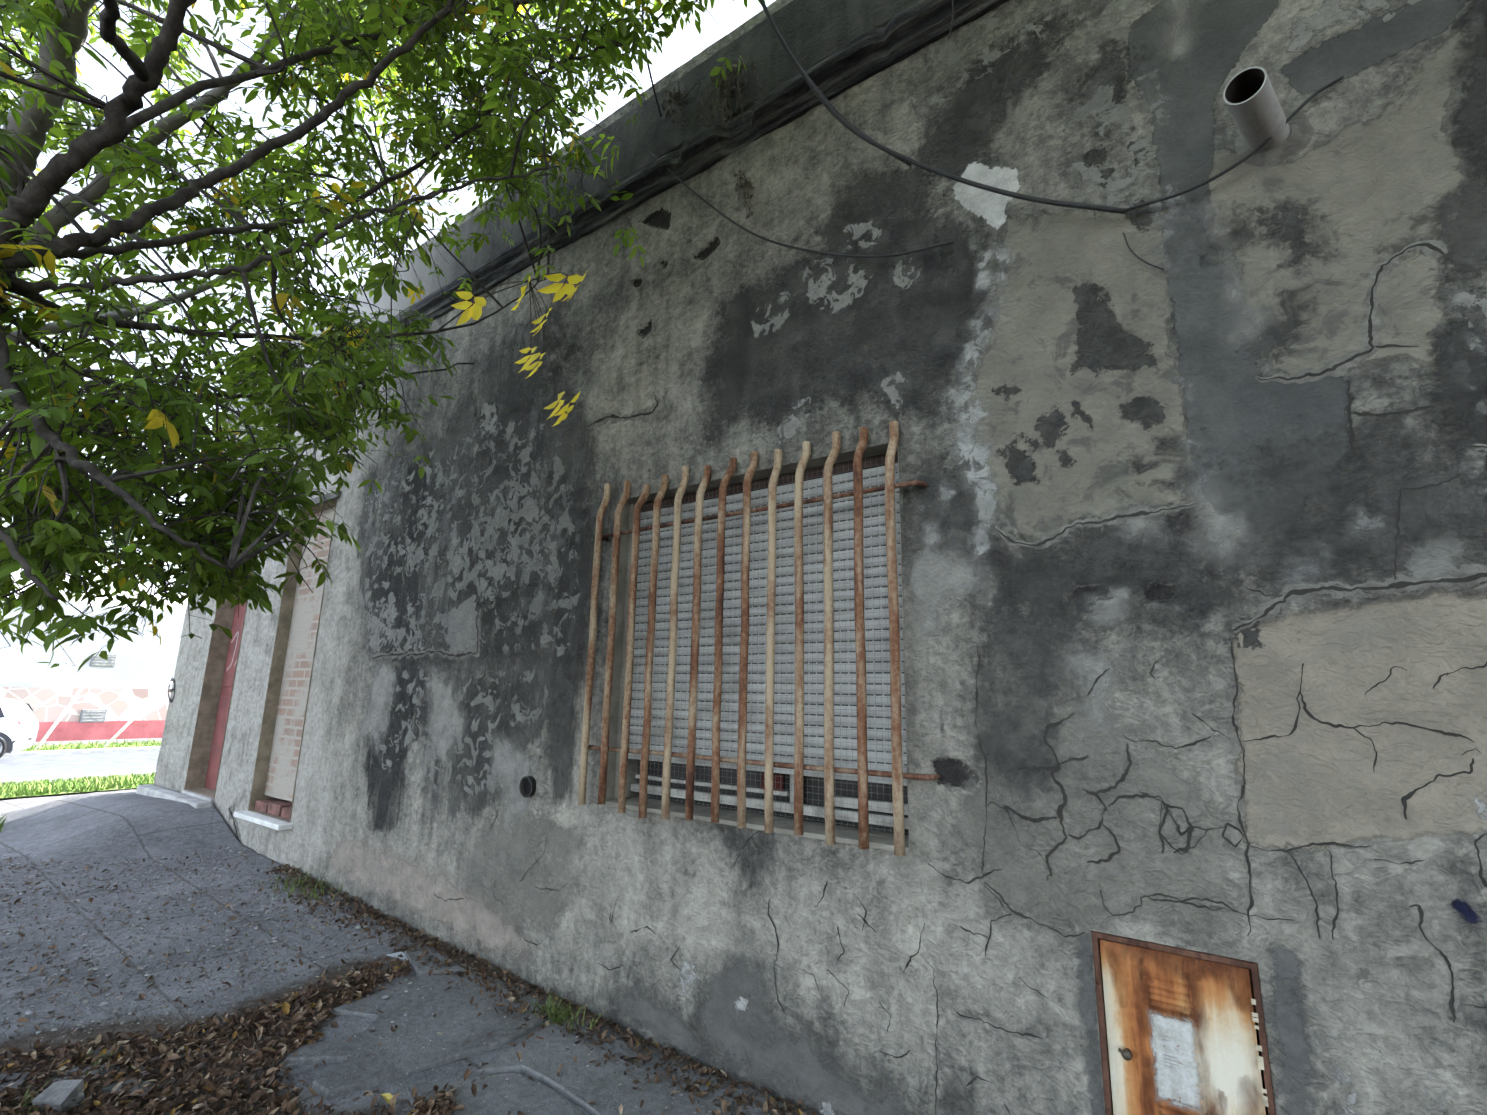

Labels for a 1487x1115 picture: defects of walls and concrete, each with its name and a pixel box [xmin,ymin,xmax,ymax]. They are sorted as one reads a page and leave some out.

peeling [750,220,885,338]
water stain [701,10,1080,444]
peeling [880,371,908,409]
peeling [947,300,1004,426]
peeling [953,161,1022,288]
water stain [903,0,1487,794]
crack [1255,239,1448,454]
peeling [362,396,581,802]
crack [928,444,1487,957]
crack [768,882,1044,1115]
rust [1138,948,1252,1049]
crack [1409,904,1487,1022]